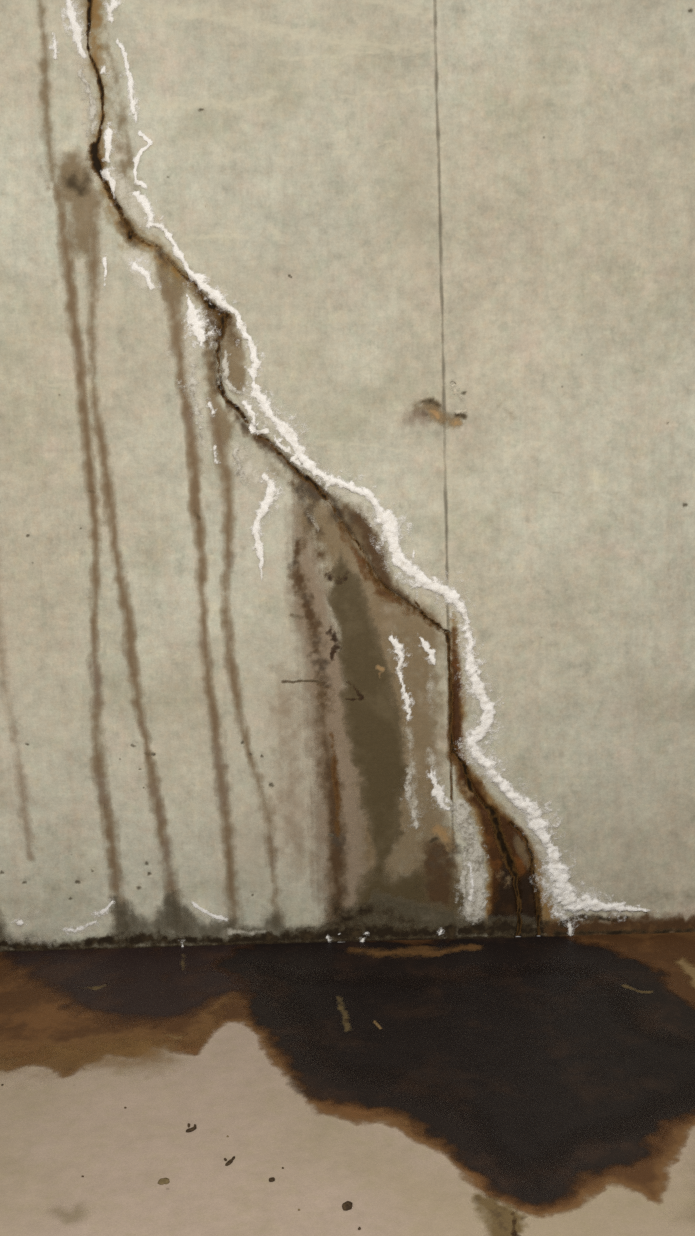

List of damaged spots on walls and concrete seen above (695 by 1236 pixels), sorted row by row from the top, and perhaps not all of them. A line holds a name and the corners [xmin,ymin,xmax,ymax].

crack [86,0,541,936]
damp [0,0,695,952]
damp [474,1194,524,1236]